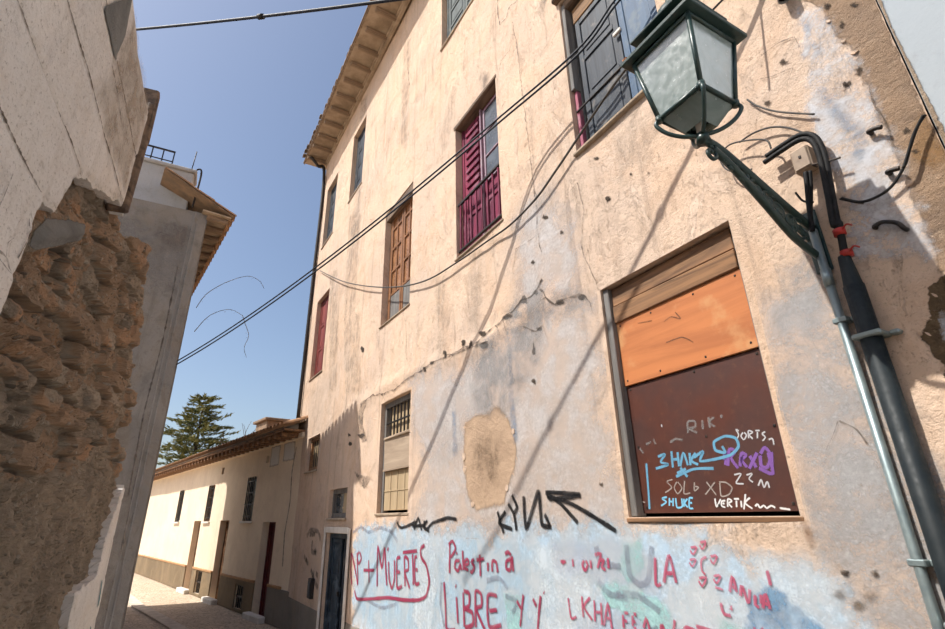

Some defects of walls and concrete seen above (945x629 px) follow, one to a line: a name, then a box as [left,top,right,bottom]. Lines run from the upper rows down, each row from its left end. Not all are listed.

crack [365,183,595,404]
spalling [804,0,945,378]
spalling [462,407,516,510]